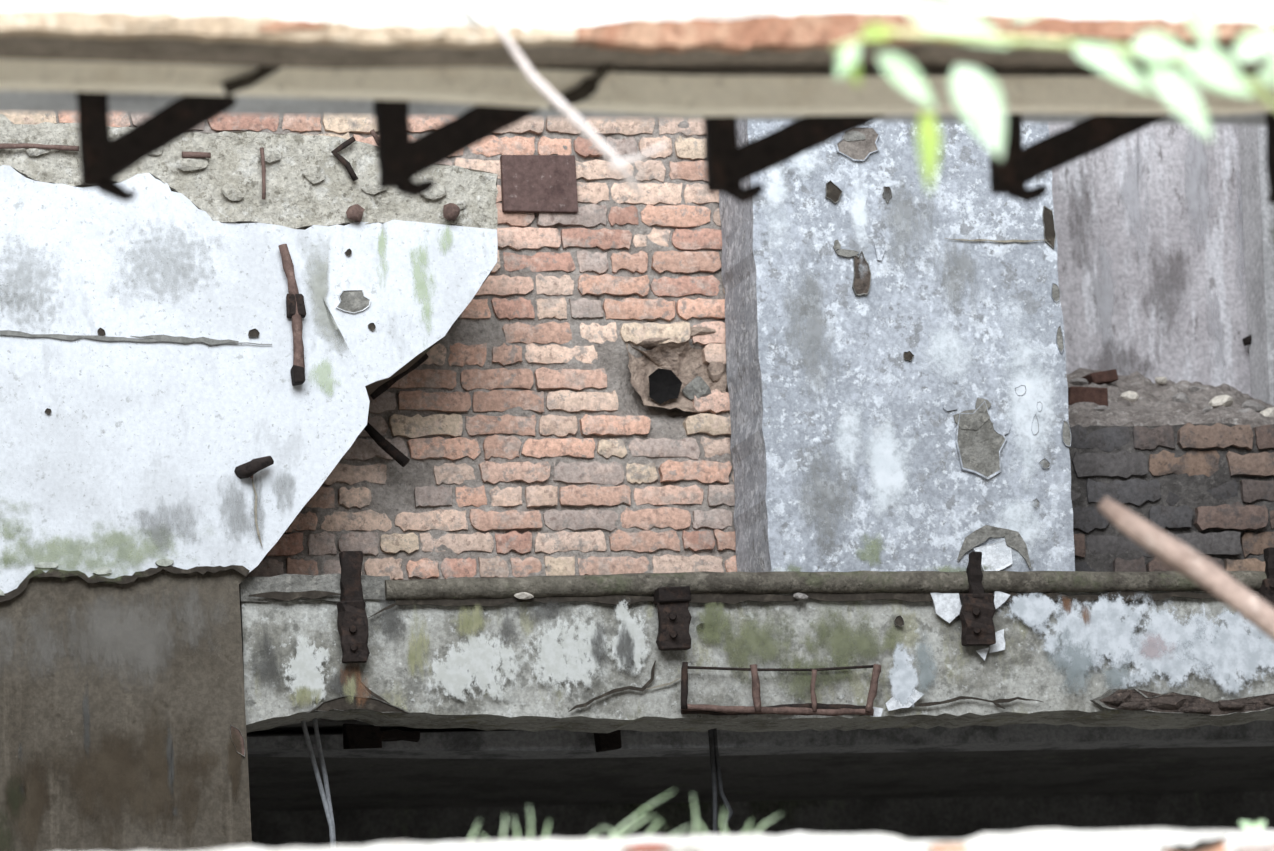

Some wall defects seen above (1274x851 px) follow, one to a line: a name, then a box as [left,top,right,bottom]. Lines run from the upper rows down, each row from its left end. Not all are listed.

spalling [0,114,81,187]
spalling [114,129,498,230]
flaking render [307,257,371,350]
spalling [648,368,682,404]
peeling [943,313,1071,571]
damp [4,509,192,569]
damp [226,479,263,535]
damp [71,601,172,673]
spalling [681,644,924,717]
peeling [930,593,962,623]
peeling [976,591,1274,716]
damp [55,697,241,840]